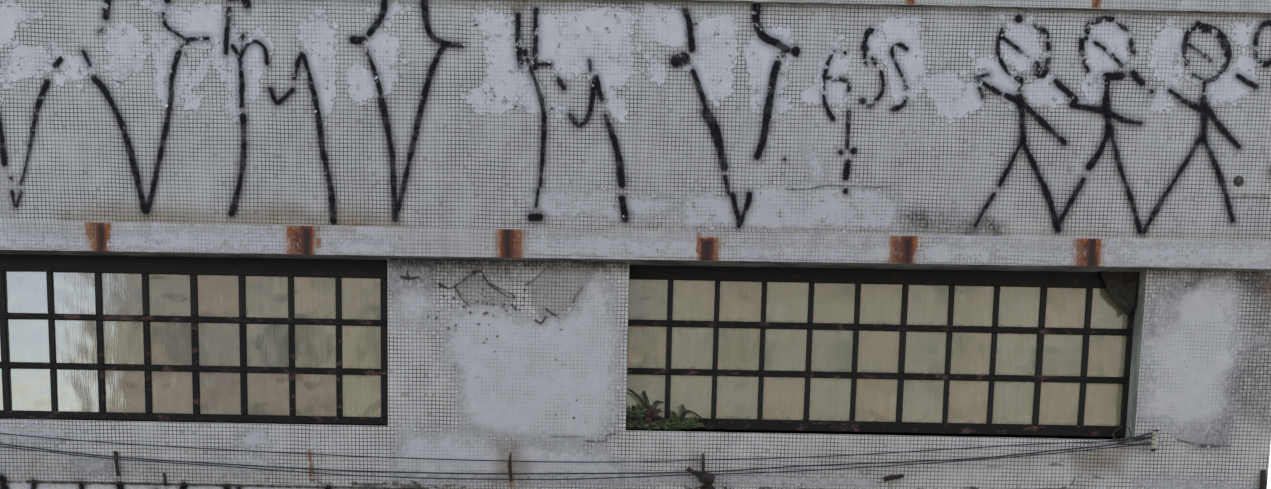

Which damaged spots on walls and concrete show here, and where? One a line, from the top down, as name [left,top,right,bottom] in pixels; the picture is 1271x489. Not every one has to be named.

peeling [0,0,274,125]
peeling [297,0,412,138]
peeling [460,2,1136,146]
peeling [1147,17,1263,114]
rust [85,222,110,251]
rust [287,226,321,254]
rust [498,229,523,258]
rust [696,233,719,261]
rust [889,235,918,264]
rust [1076,238,1101,266]
crack [438,266,549,305]
peeling [0,227,878,489]